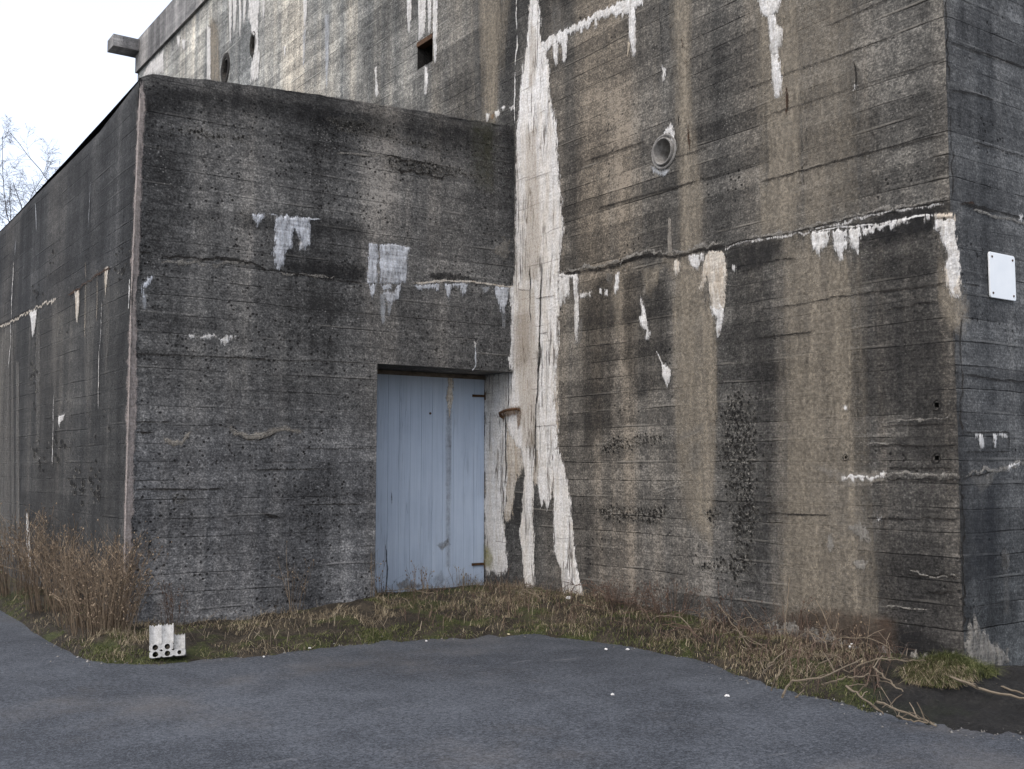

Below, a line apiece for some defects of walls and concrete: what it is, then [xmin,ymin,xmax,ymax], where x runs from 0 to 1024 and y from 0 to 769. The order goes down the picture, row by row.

water stain [170,0,383,132]
crack [139,251,361,283]
water stain [402,0,582,595]
water stain [614,0,715,533]
crack [519,115,1024,472]
water stain [875,206,963,327]
crack [763,510,827,518]
water stain [783,250,954,654]
crack [821,319,1024,626]